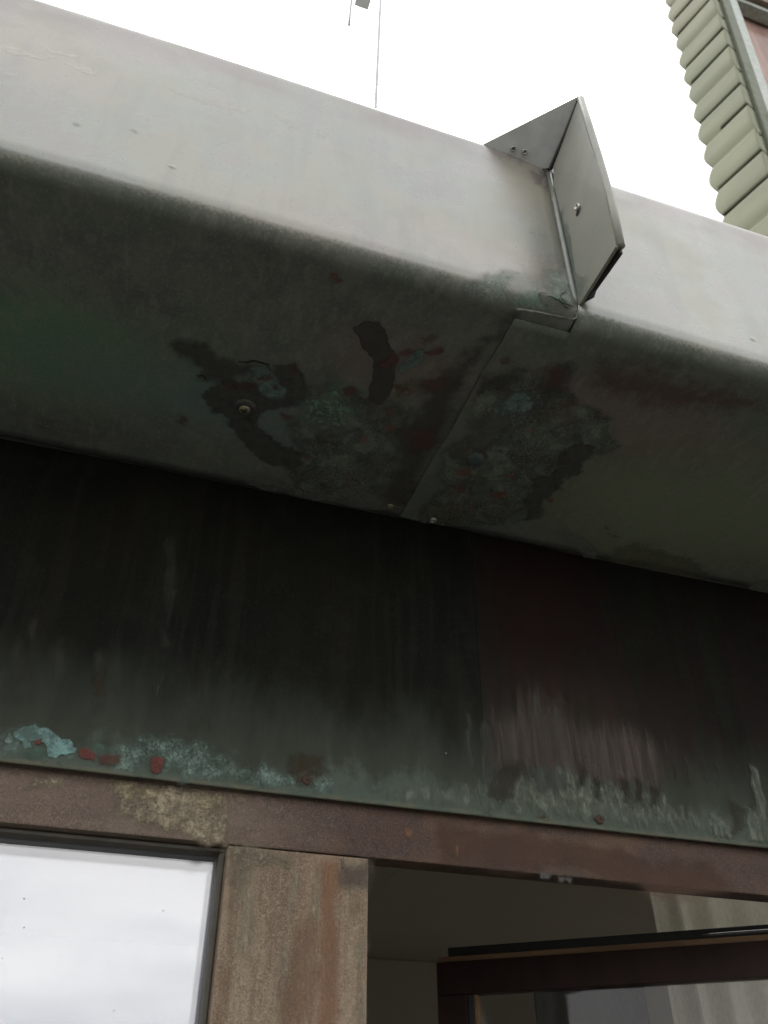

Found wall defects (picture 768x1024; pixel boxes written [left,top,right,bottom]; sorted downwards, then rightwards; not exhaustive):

peeling [353,321,413,405]
peeling [173,341,310,471]
peeling [15,727,120,765]
damp [110,738,333,791]
damp [395,695,768,841]